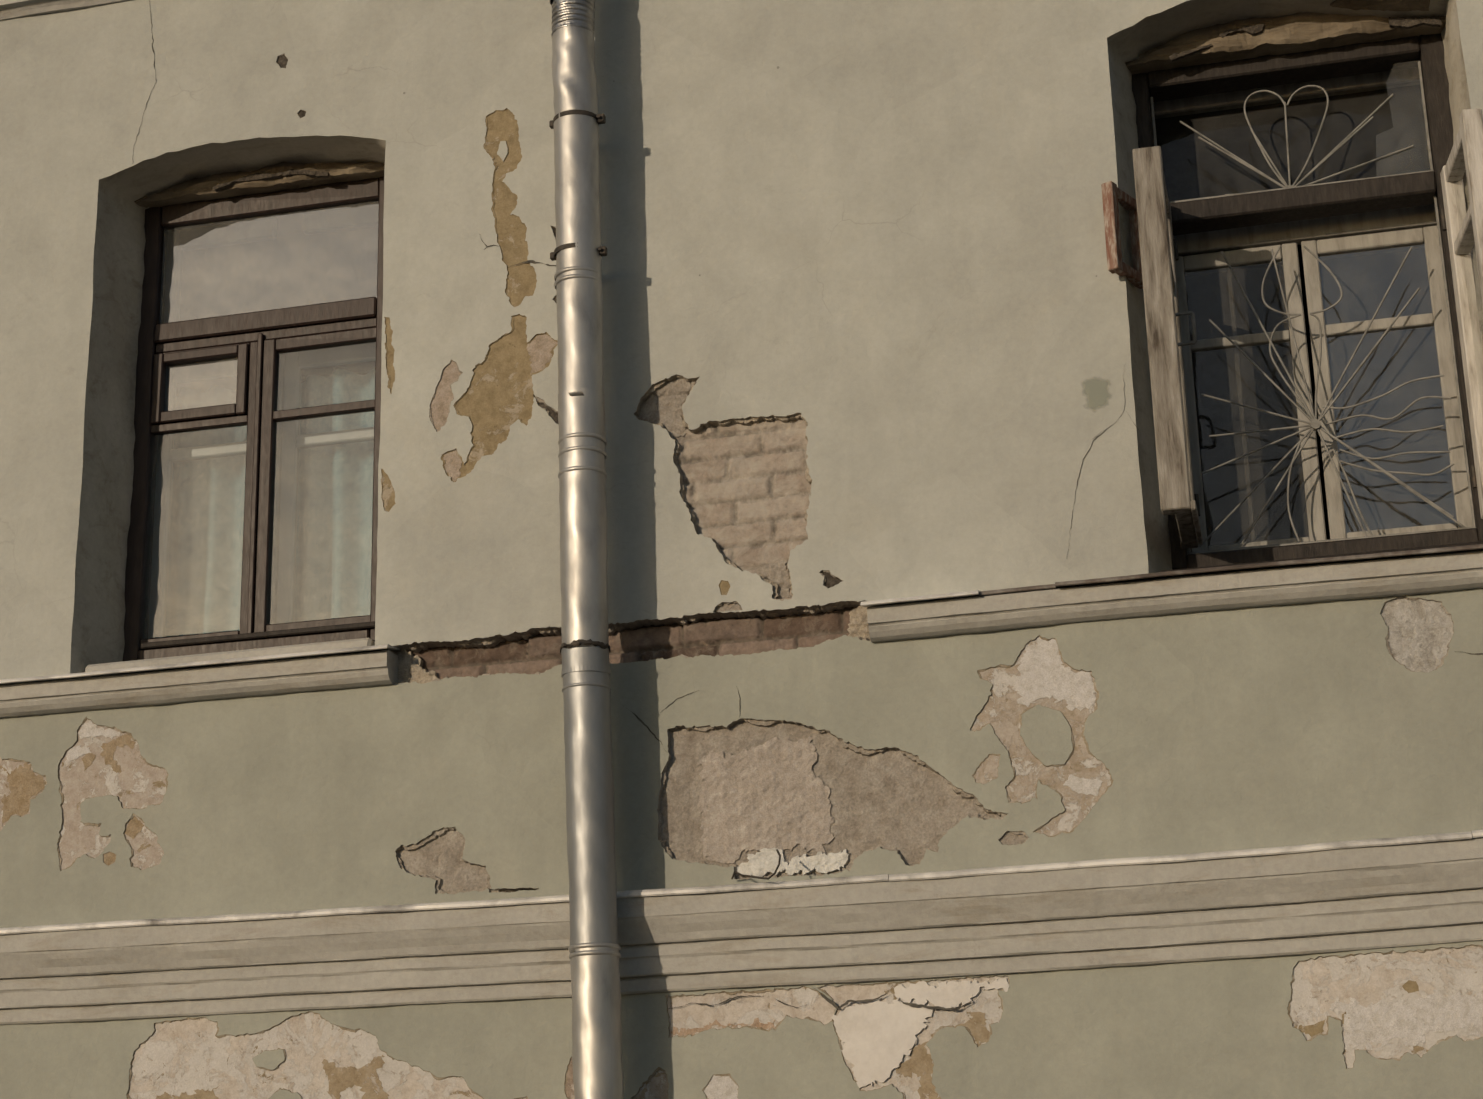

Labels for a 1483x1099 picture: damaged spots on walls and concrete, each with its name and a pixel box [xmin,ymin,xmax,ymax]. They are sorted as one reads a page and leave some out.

peeling [429,108,558,482]
spalling [608,374,865,635]
crack [1067,380,1141,555]
spalling [391,626,562,655]
spalling [1380,596,1454,673]
peeling [0,717,169,871]
spalling [657,635,1114,880]
spalling [395,827,539,895]
peeling [126,1011,484,1099]
peeling [702,1074,739,1099]
peeling [665,986,836,1038]
peeling [1287,944,1483,1069]